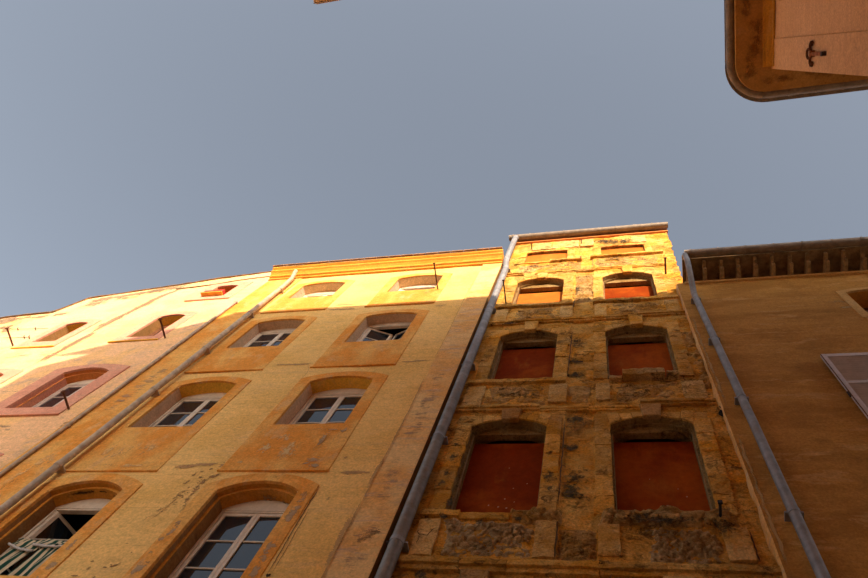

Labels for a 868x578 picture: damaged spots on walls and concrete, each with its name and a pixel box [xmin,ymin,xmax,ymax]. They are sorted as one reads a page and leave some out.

leakage [0,317,19,332]
leakage [43,286,182,359]
peeling [173,463,224,506]